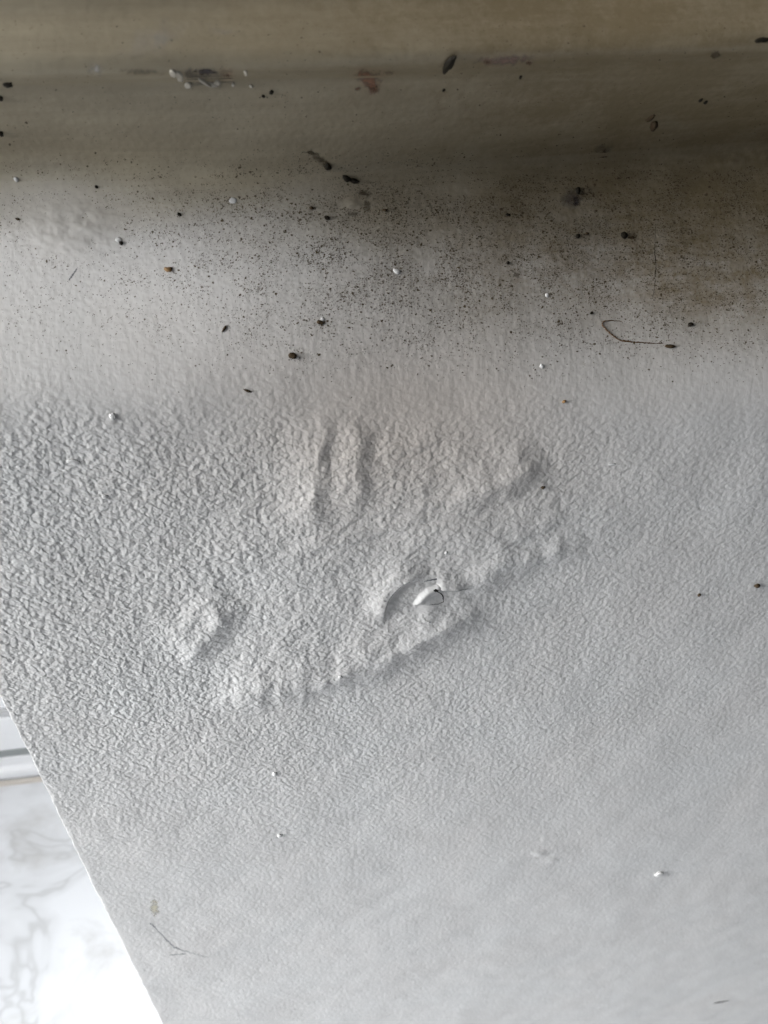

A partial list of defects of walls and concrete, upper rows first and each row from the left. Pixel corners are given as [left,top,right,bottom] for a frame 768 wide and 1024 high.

water stain [0,66,768,391]
peeling [353,546,475,625]